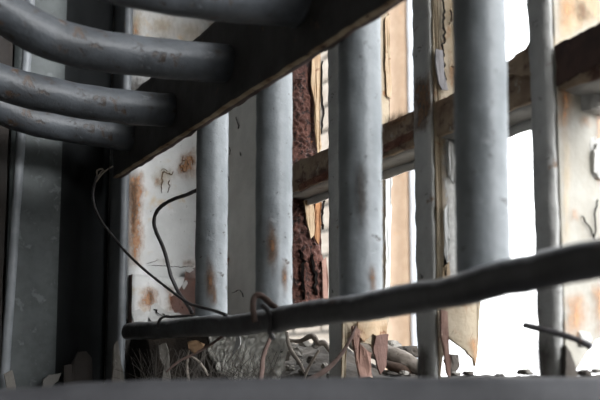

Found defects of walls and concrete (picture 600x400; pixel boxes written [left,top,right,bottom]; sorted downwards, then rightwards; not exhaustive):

peeling [384,13,392,99]
rust [292,76,313,164]
rust [131,176,142,258]
crack [161,155,195,193]
rust [292,198,323,304]
rust [298,170,328,192]
peeling [384,178,393,288]
rust [142,290,154,306]